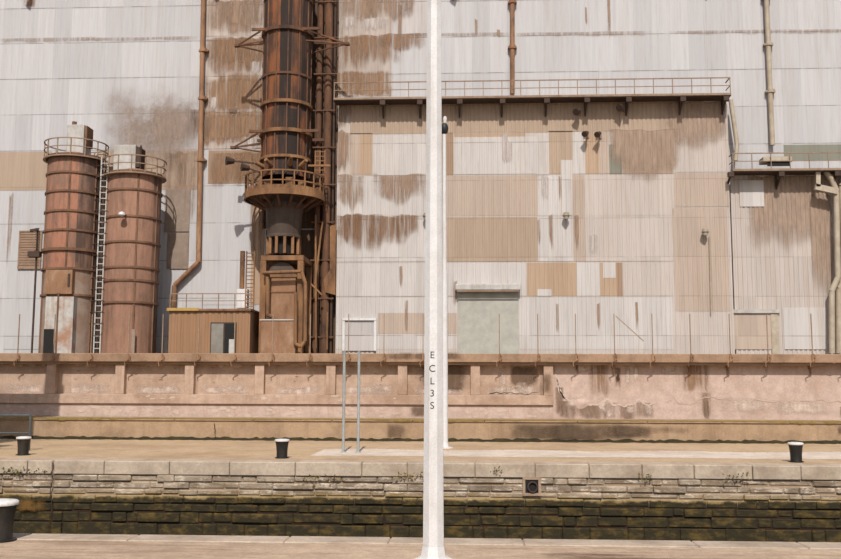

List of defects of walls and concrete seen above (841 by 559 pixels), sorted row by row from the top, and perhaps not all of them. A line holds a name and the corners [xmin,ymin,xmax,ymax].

corrosion [337,0,422,246]